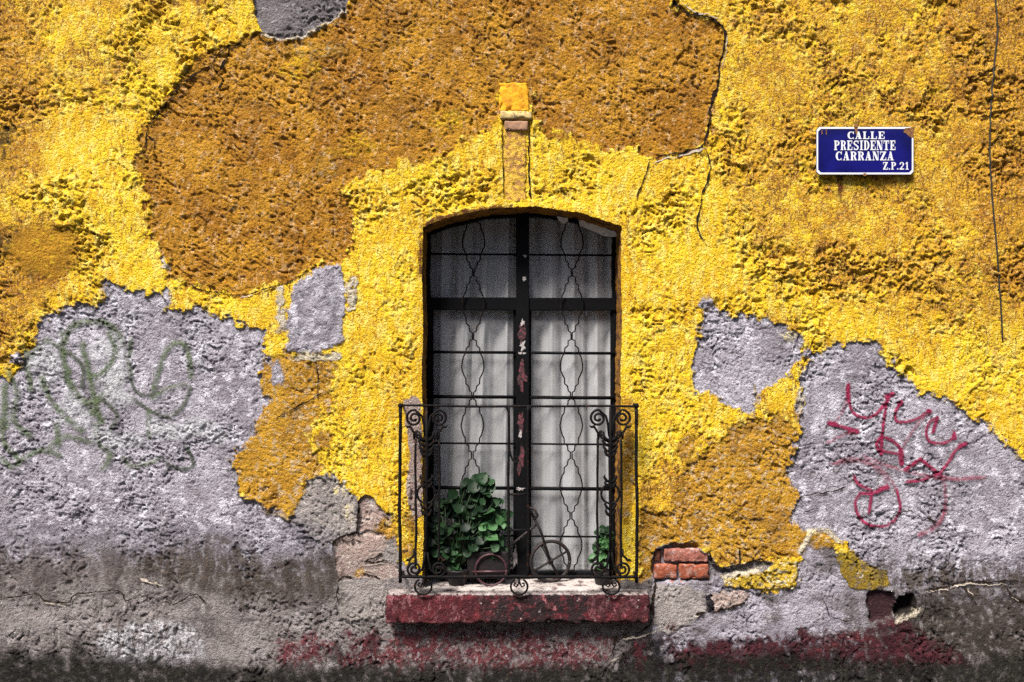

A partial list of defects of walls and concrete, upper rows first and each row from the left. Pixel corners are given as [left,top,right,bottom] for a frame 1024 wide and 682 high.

crack [636,0,728,246]
peeling [0,0,729,580]
flaking render [622,297,1024,596]
leakage [97,620,205,664]
leakage [1,537,342,610]
leakage [866,555,1024,666]